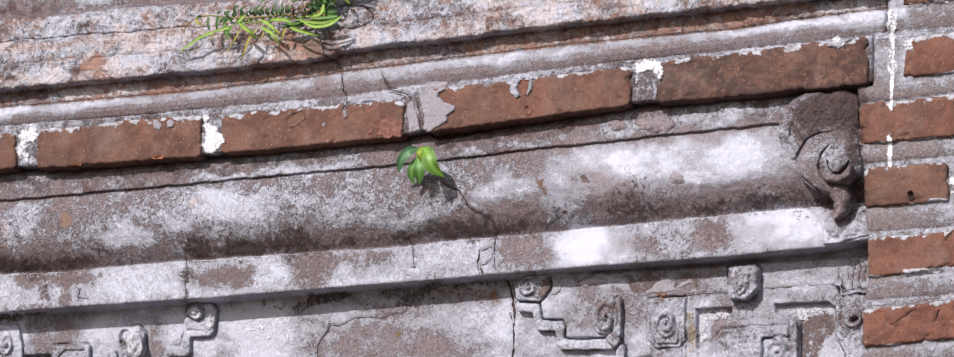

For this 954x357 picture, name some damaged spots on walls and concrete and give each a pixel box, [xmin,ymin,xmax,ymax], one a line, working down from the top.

crack [315,3,375,111]
flaking render [342,81,455,138]
crack [435,177,518,357]
crack [316,311,406,357]